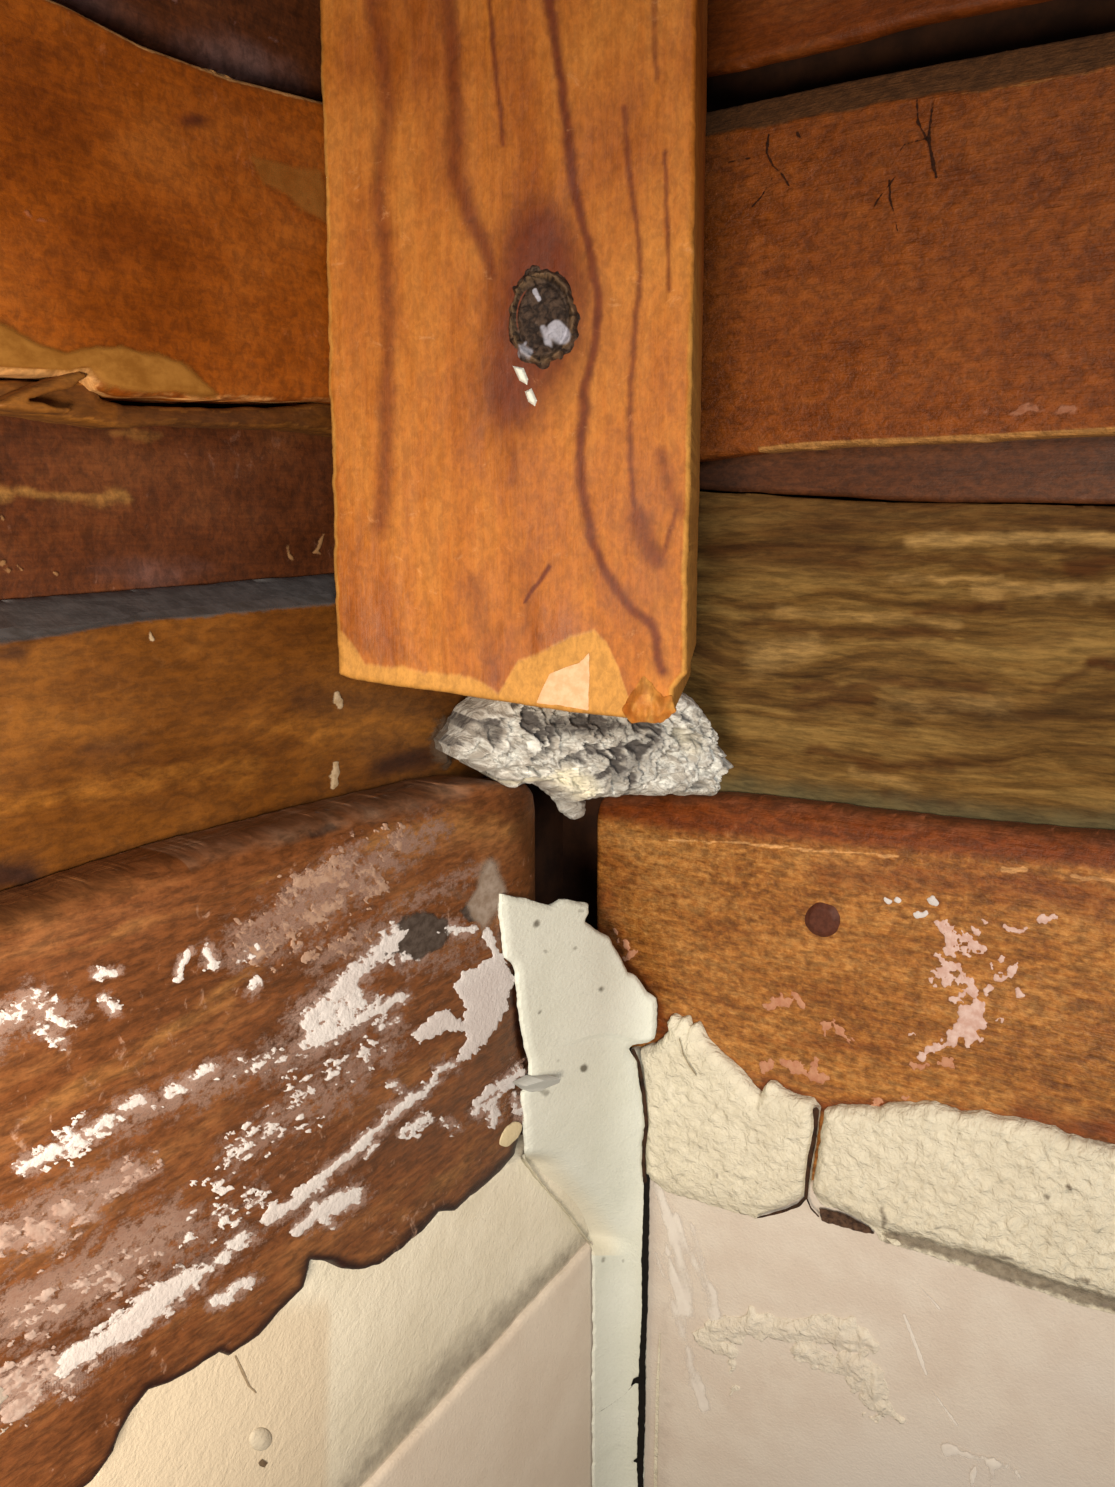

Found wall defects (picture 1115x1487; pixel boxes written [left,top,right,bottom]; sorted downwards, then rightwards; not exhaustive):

peeling [613,928,638,961]
peeling [762,991,805,1011]
peeling [884,895,1058,1071]
peeling [820,1018,855,1043]
peeling [759,1056,830,1085]
peeling [0,822,560,1435]
crack [757,1107,819,1218]
spalling [819,1208,901,1246]